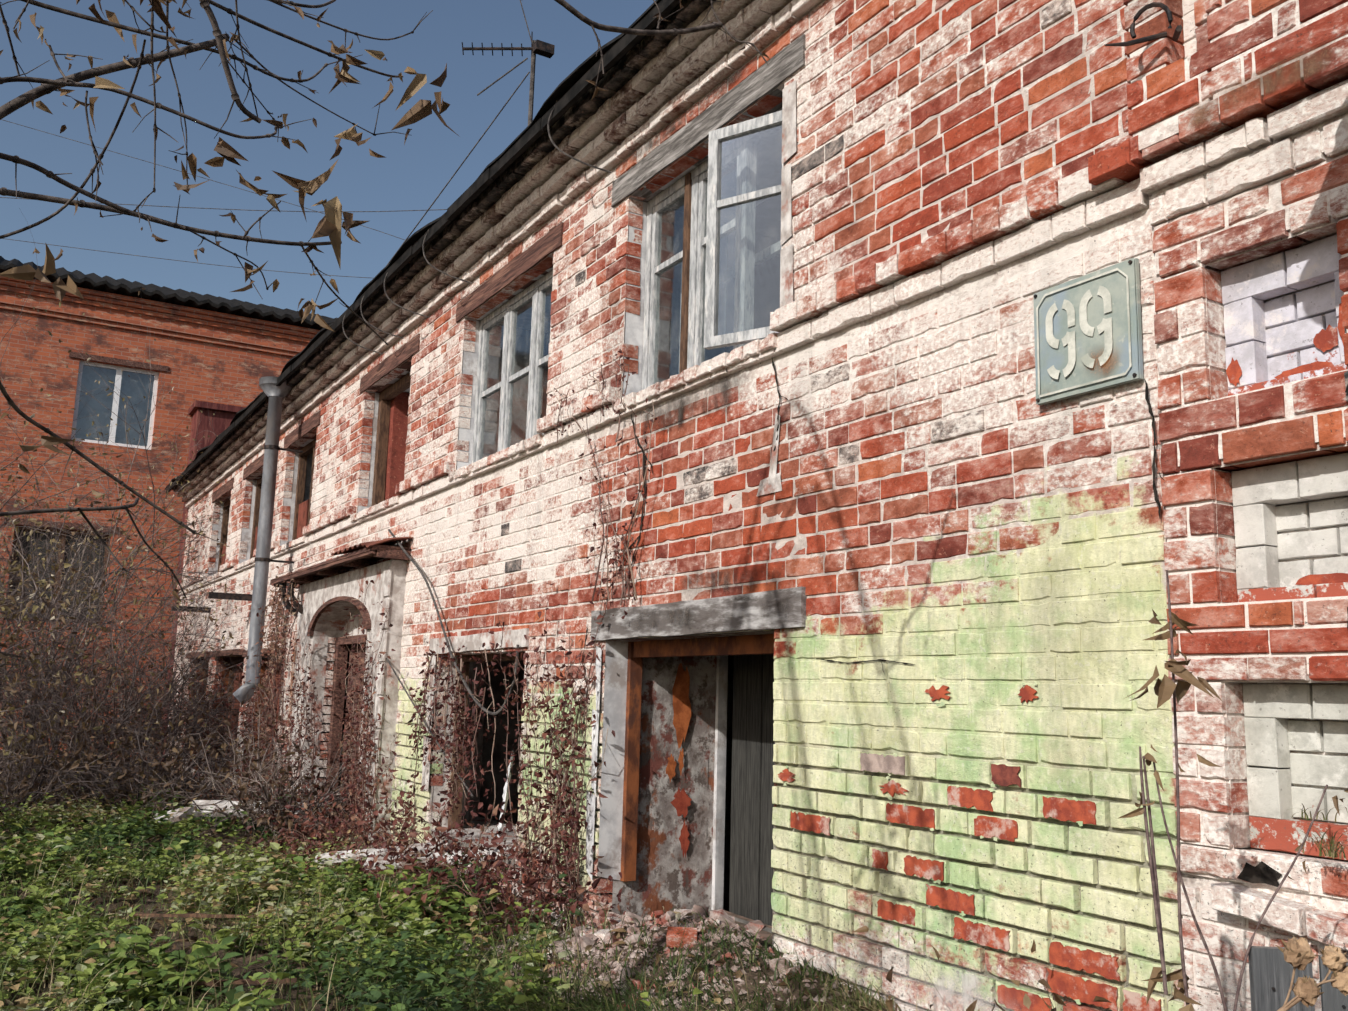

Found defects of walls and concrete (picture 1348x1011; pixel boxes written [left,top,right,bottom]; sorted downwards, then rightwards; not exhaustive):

crack [1144,378,1165,518]
peeling [860,753,1021,842]
peeling [1043,796,1096,826]
peeling [872,848,888,871]
peeling [877,855,1010,952]
hole [1237,861,1282,887]
spalling [433,908,864,1011]
peeling [996,941,1161,1011]